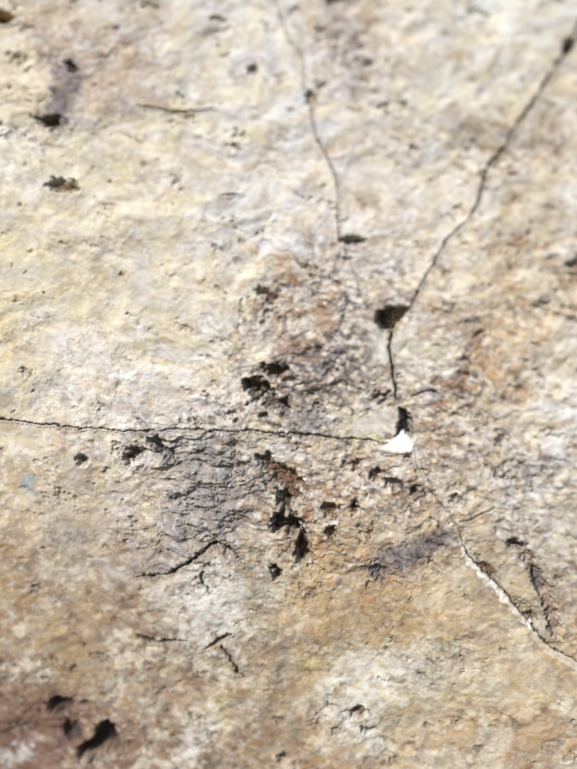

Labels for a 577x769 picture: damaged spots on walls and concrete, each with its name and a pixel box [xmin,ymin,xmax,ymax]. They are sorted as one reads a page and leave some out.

crack [407,24,577,311]
spalling [252,284,277,306]
spalling [242,361,290,418]
peeling [365,305,419,367]
crack [372,331,462,404]
crack [0,416,391,447]
peeling [343,400,429,493]
spalling [254,451,312,562]
spalling [320,497,362,537]
crack [132,521,245,595]
crack [412,440,577,671]
crack [134,632,244,677]